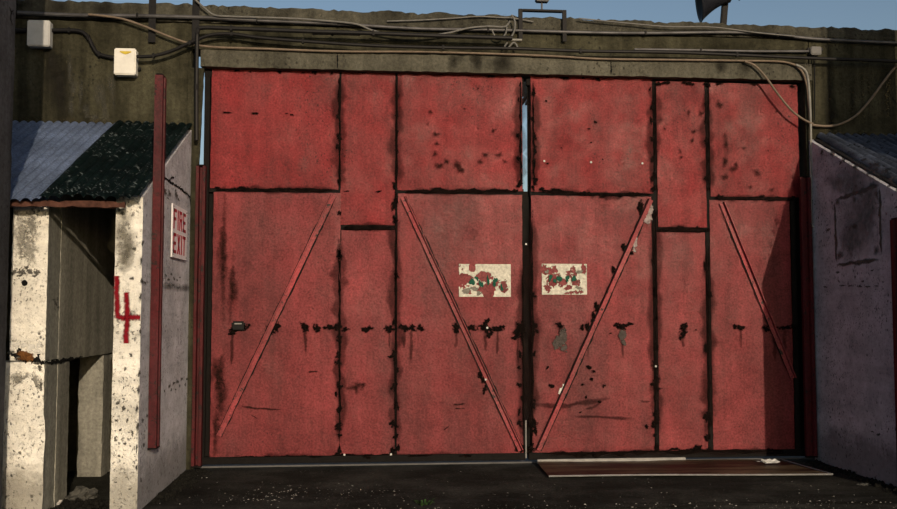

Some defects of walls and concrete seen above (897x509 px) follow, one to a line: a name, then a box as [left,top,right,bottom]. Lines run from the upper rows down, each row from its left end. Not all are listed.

crack [165,176,191,202]
crack [7,347,83,365]